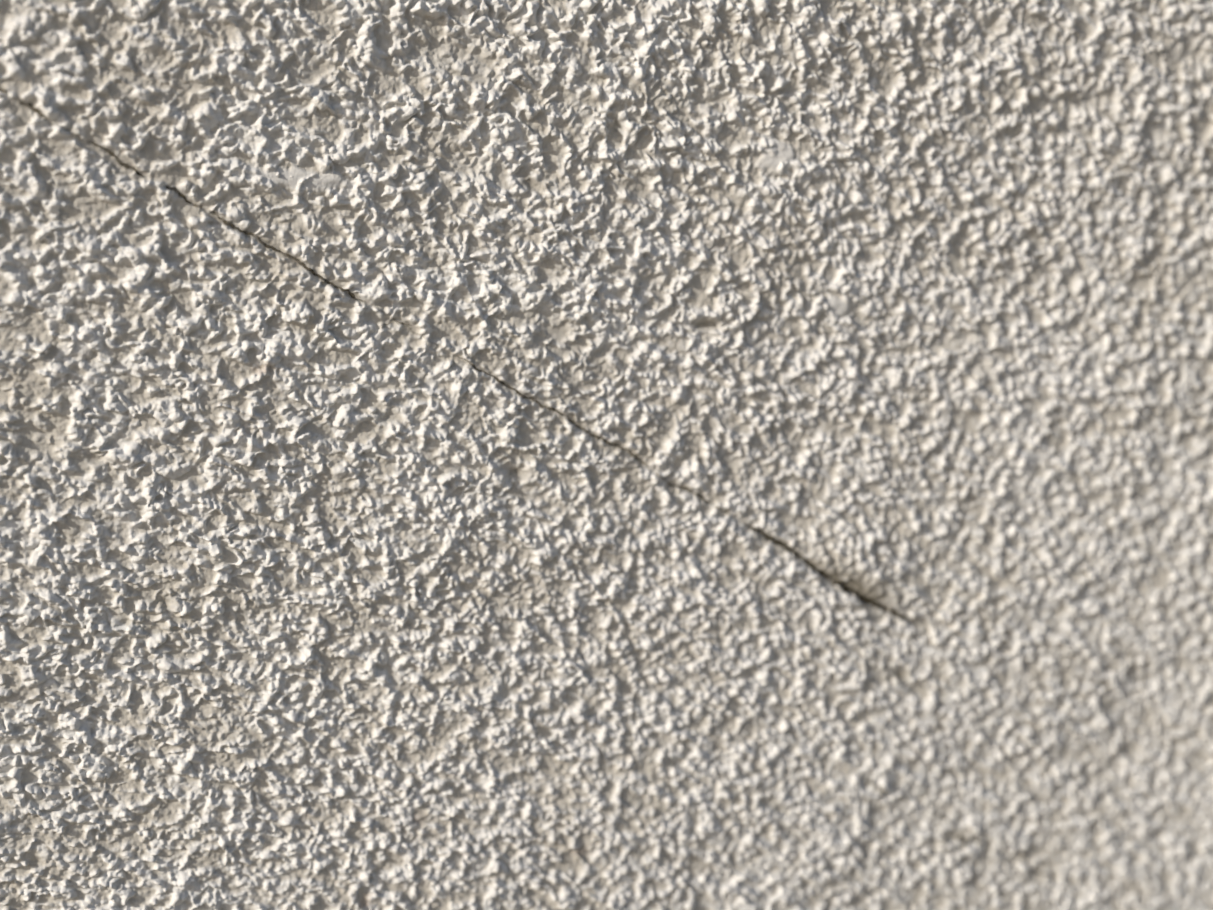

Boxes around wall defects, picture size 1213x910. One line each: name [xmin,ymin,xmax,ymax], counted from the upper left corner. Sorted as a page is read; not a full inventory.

crack [0,88,47,119]
crack [88,141,361,301]
crack [464,359,915,623]